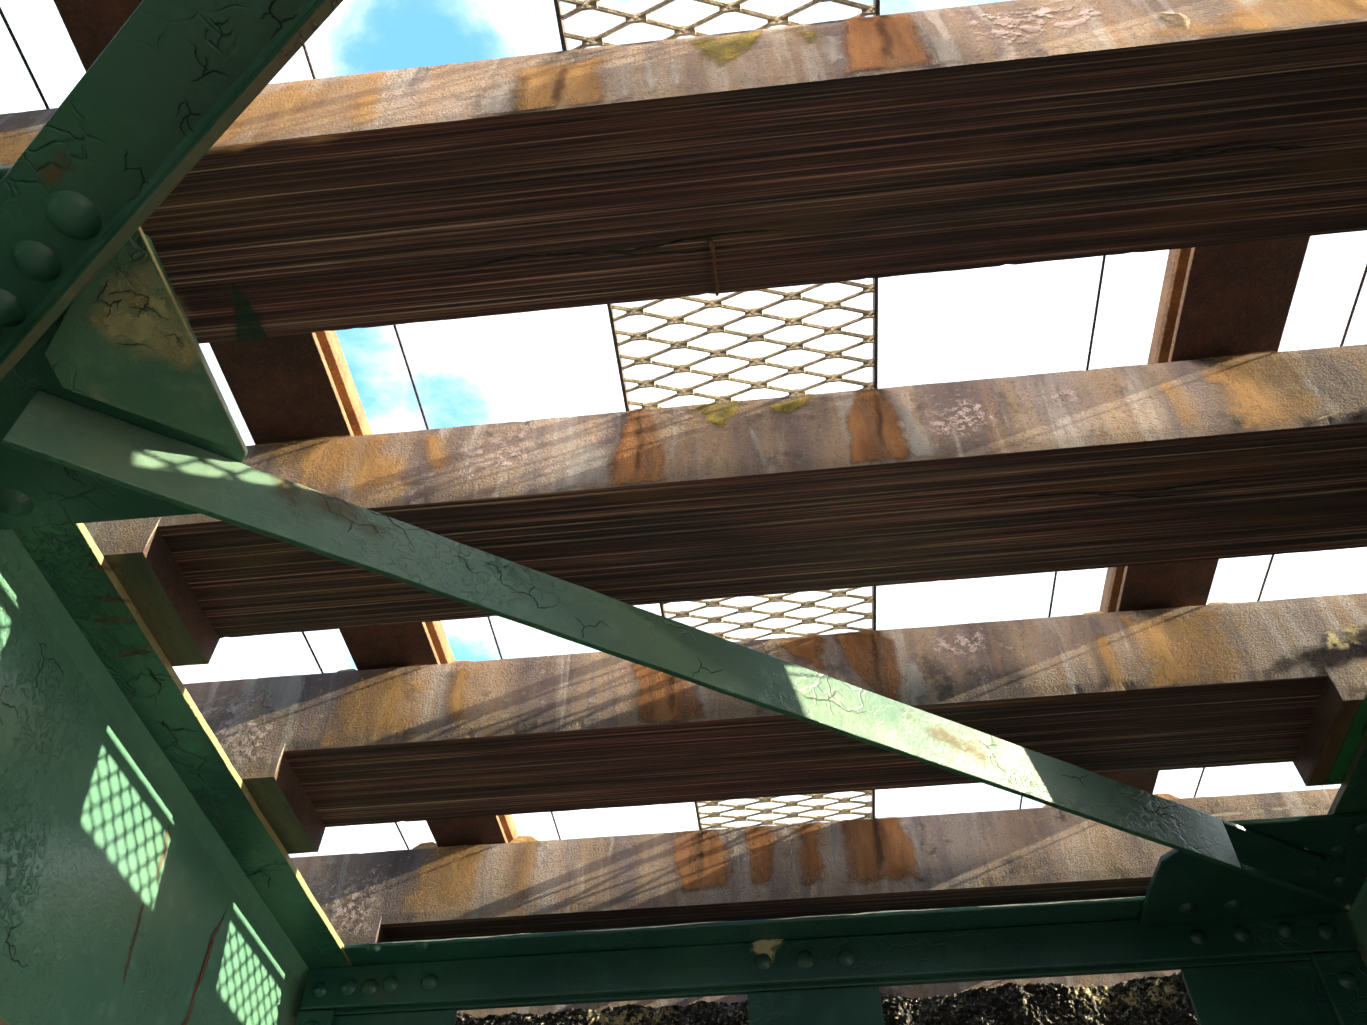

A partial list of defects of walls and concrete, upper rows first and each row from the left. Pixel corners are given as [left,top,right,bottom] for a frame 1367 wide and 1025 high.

crack [176,0,298,137]
corrosion [843,13,930,73]
crack [92,279,182,367]
corrosion [608,408,664,485]
corrosion [846,389,910,463]
corrosion [674,829,731,891]
corrosion [746,825,774,883]
corrosion [800,822,823,883]
corrosion [842,815,921,882]
corrosion [182,913,225,1025]
peeling [753,939,782,959]